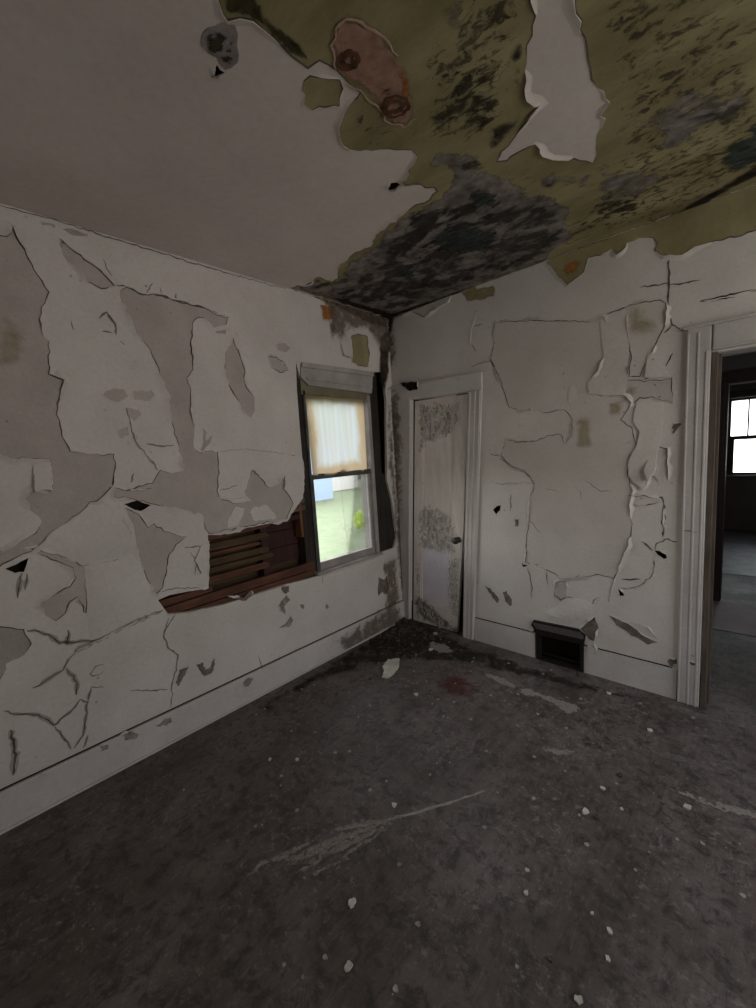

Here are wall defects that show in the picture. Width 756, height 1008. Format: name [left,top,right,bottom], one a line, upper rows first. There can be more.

corrosion [330,18,415,128]
peeling [201,0,756,316]
peeling [341,332,377,372]
water stain [294,0,756,649]
peeling [0,220,305,621]
crack [491,437,607,528]
peeling [491,298,682,601]
peeling [0,624,38,686]
crack [4,546,201,775]
crack [523,563,599,604]
flaking render [608,614,659,645]
crack [621,497,696,590]